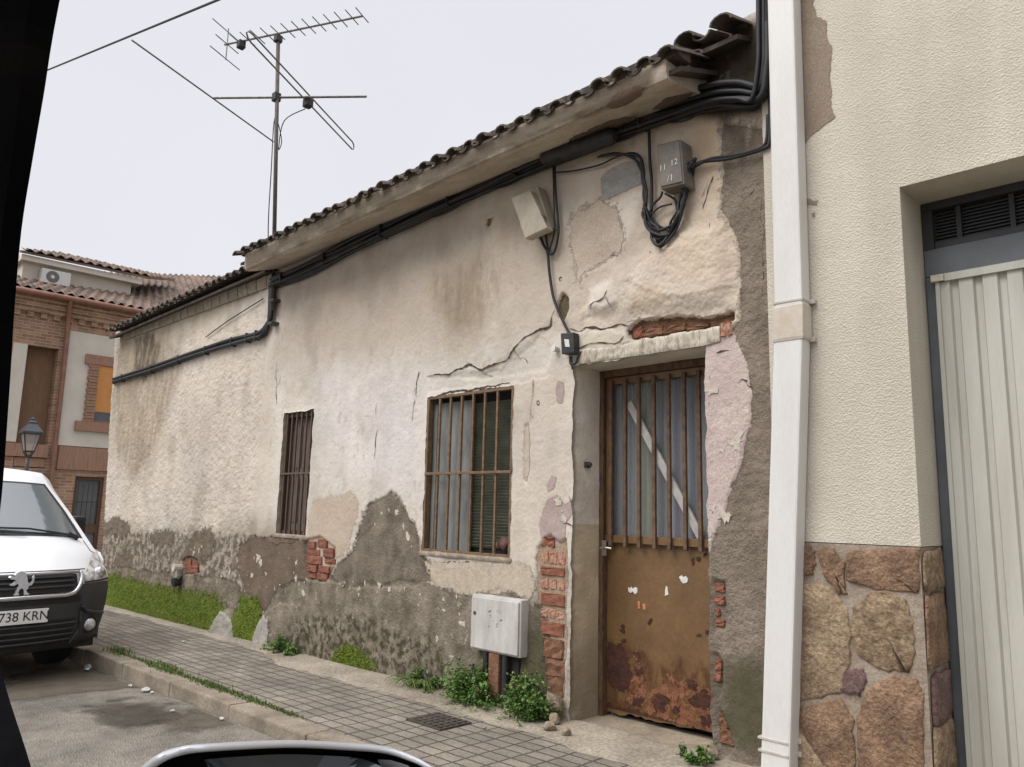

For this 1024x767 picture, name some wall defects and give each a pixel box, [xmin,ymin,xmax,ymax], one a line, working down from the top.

crack [412,290,632,417]
flaking render [628,116,772,767]
leakage [102,516,246,581]
flaking render [107,476,572,699]
corrosion [607,624,712,732]